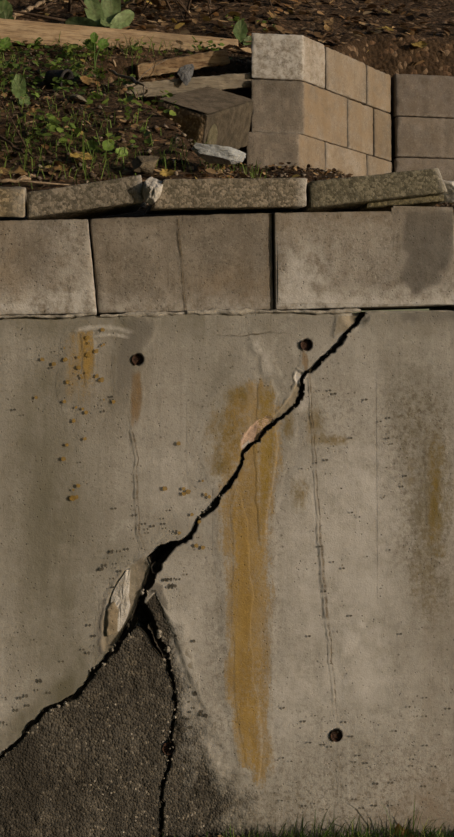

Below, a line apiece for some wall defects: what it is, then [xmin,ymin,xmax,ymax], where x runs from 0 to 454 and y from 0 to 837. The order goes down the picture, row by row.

spalling [0,553,294,837]
crack [0,312,365,837]